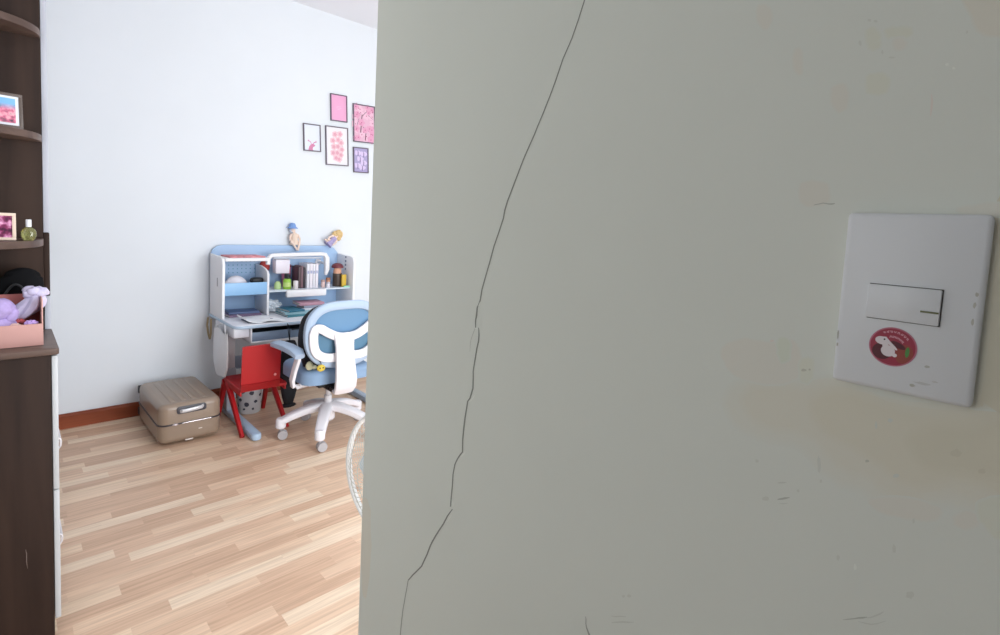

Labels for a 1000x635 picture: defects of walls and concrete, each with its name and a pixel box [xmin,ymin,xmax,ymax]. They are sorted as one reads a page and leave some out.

crack [400,0,585,635]